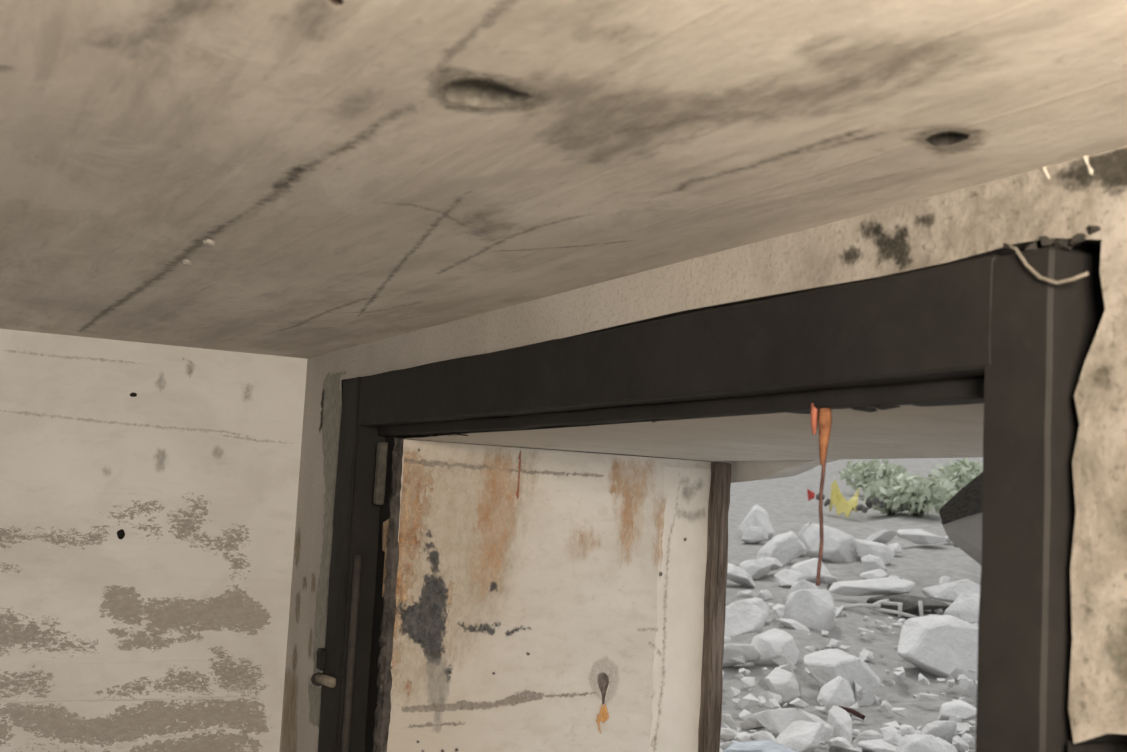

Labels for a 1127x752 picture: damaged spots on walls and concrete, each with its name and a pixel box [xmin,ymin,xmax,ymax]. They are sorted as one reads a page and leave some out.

spalling [435,68,544,111]
water stain [1058,148,1127,193]
water stain [842,248,859,262]
water stain [862,222,911,269]
corrosion [810,403,818,435]
corrosion [391,452,433,672]
peeling [0,493,273,752]
water stain [396,530,531,682]